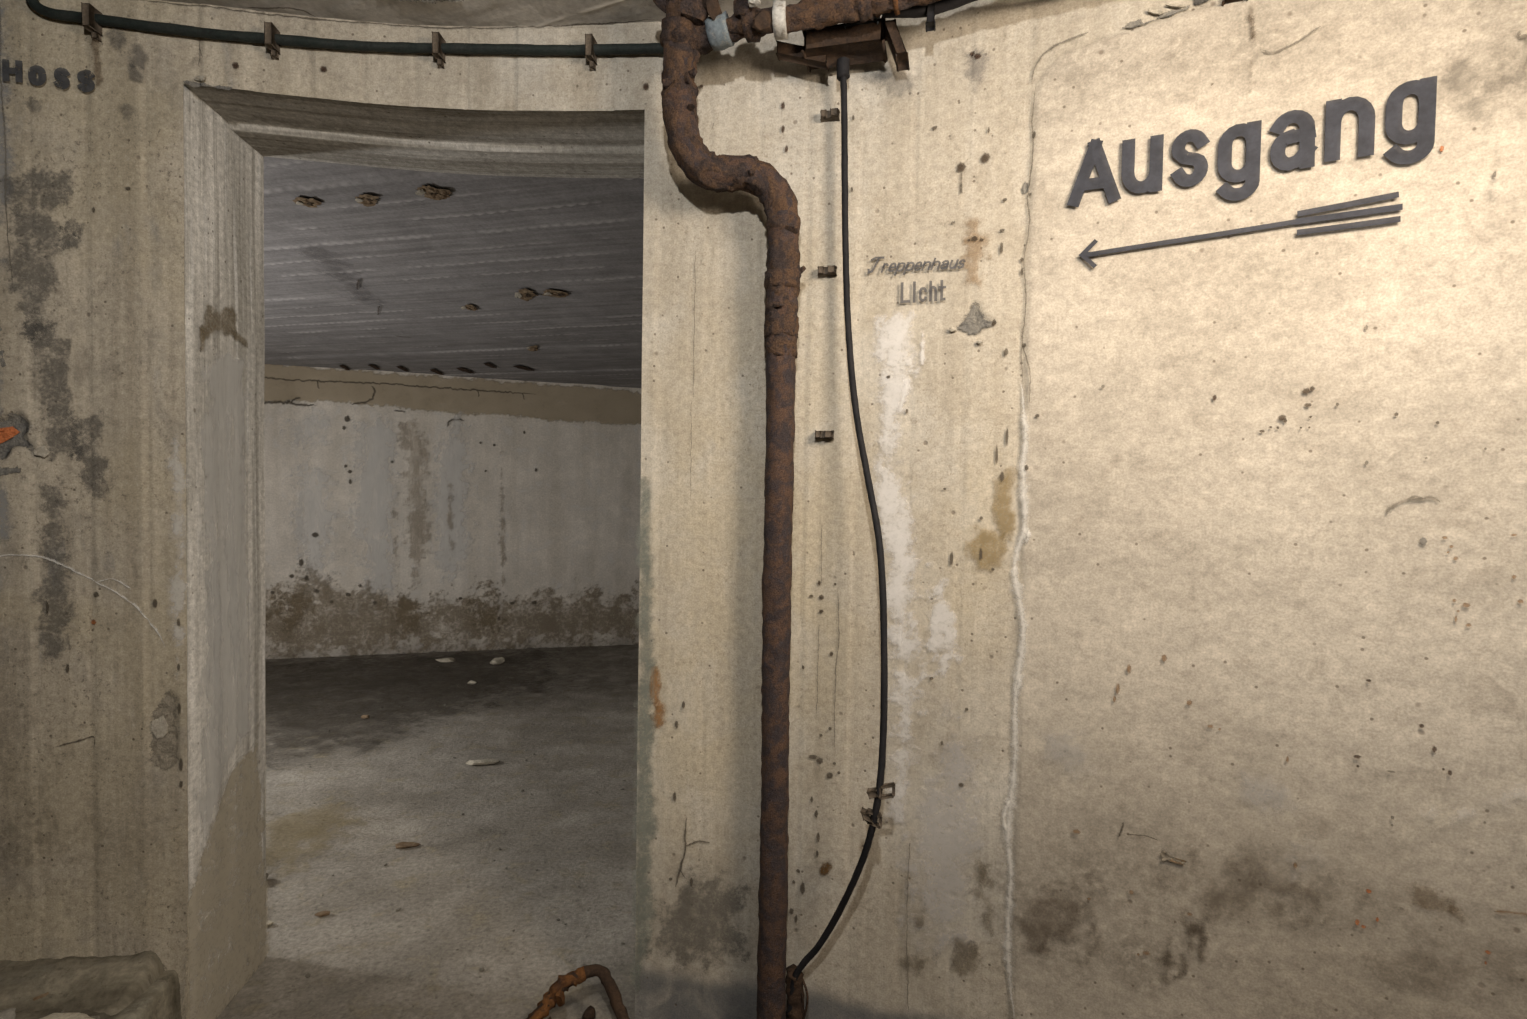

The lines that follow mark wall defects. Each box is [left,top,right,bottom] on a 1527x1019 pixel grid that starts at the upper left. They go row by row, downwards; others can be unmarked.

spalling [0,413,50,476]
leakage [182,305,749,1019]
spalling [430,345,538,375]
leakage [875,313,960,822]
crack [1002,32,1088,1018]
corrosion [526,966,586,1019]